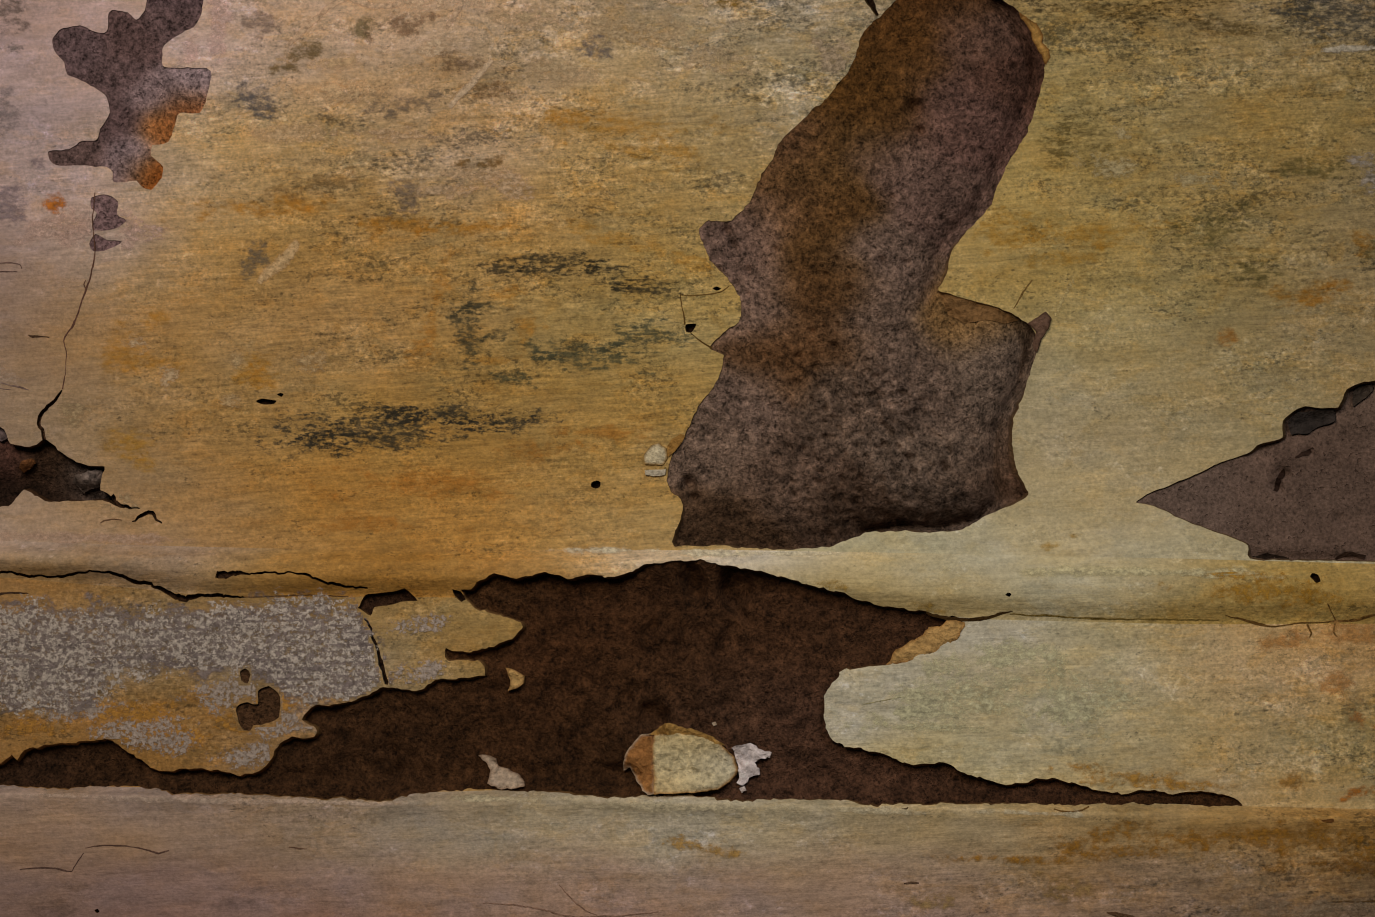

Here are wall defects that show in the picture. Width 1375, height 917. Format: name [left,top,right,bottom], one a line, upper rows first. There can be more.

crack [865,0,879,16]
crack [37,193,96,442]
crack [100,494,162,524]
flaking render [0,0,1242,807]
flaking render [1136,381,1375,584]
crack [0,570,388,685]